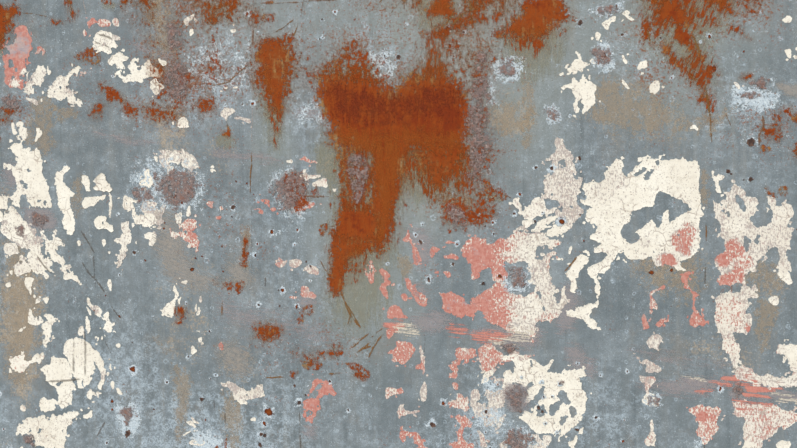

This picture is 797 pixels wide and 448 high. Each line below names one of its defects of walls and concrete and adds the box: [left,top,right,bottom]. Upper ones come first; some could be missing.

corrosion [1,94,23,123]
corrosion [0,0,79,49]
peeling [83,17,167,97]
peeling [559,51,601,118]
corrosion [590,40,618,74]
corrosion [587,1,632,21]
corrosion [638,0,763,116]
corrosion [88,0,577,328]
peeling [81,169,203,296]
peeling [0,121,122,448]
peeling [151,278,202,319]
peeling [403,137,797,448]